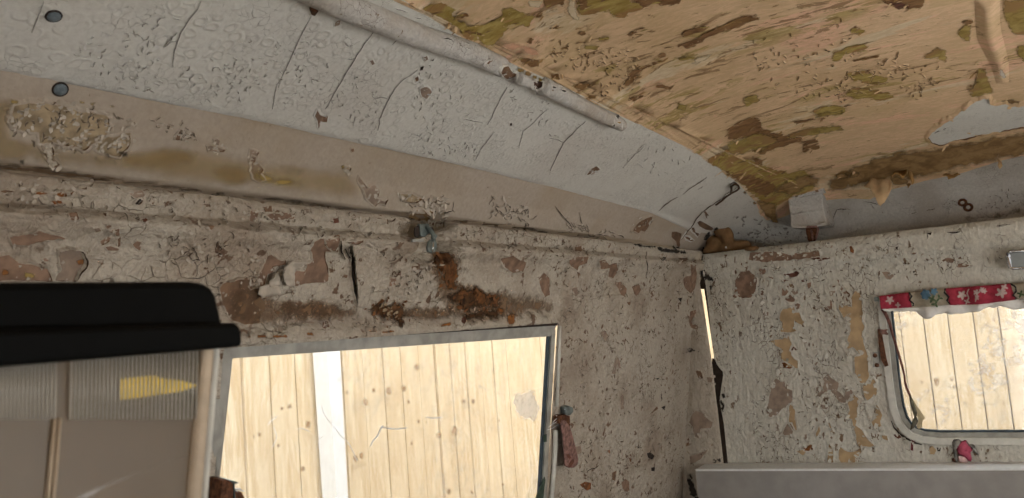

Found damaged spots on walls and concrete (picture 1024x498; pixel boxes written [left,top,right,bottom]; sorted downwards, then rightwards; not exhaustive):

peeling [634,0,681,9]
peeling [4,97,134,172]
spalling [531,74,596,99]
crack [551,42,641,97]
peeling [794,88,893,125]
peeling [726,156,809,197]
peeling [217,214,366,327]
rust [364,296,427,333]
rust [431,251,515,327]
crack [0,137,1024,498]
peeling [661,210,715,331]
peeling [730,244,942,463]